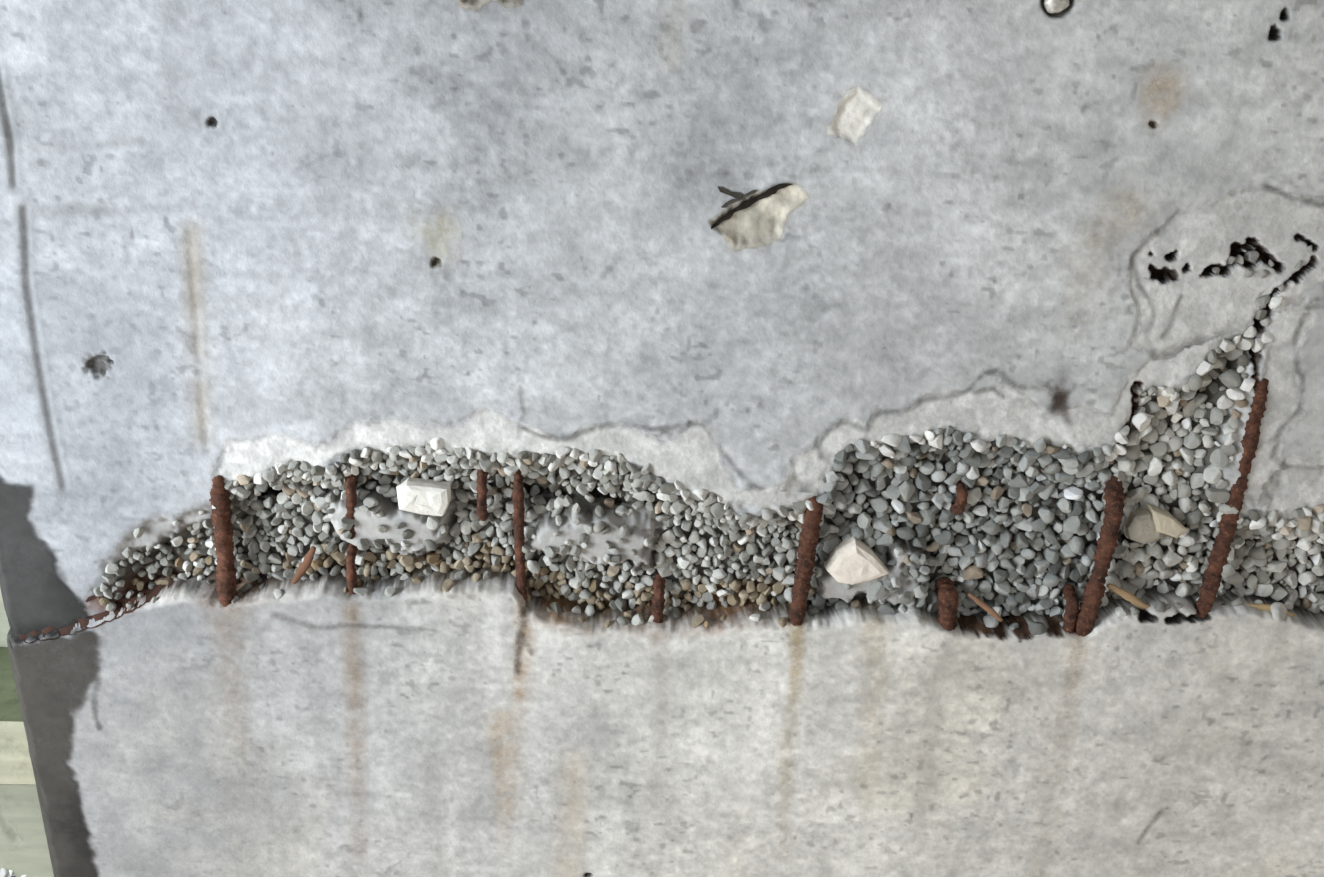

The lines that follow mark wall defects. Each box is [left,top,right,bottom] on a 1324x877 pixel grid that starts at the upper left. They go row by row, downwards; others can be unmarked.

spalling [457,0,522,11]
spalling [827,87,882,143]
spalling [87,355,114,377]
spalling [93,183,1324,642]